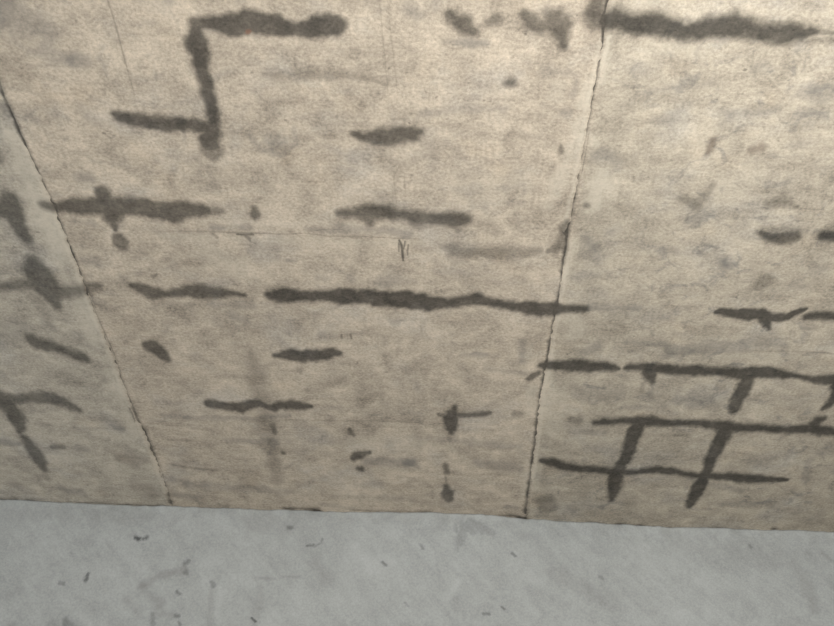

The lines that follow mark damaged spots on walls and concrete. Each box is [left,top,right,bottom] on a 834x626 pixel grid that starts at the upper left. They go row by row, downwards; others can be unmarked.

crack [106,0,152,100]
water stain [107,5,391,164]
water stain [440,0,604,54]
water stain [611,1,834,52]
crack [0,75,223,506]
water stain [0,180,228,366]
water stain [261,284,592,321]
crack [496,0,617,519]
water stain [524,356,834,511]
crack [278,504,325,512]
crack [350,506,433,514]
crack [611,519,647,527]